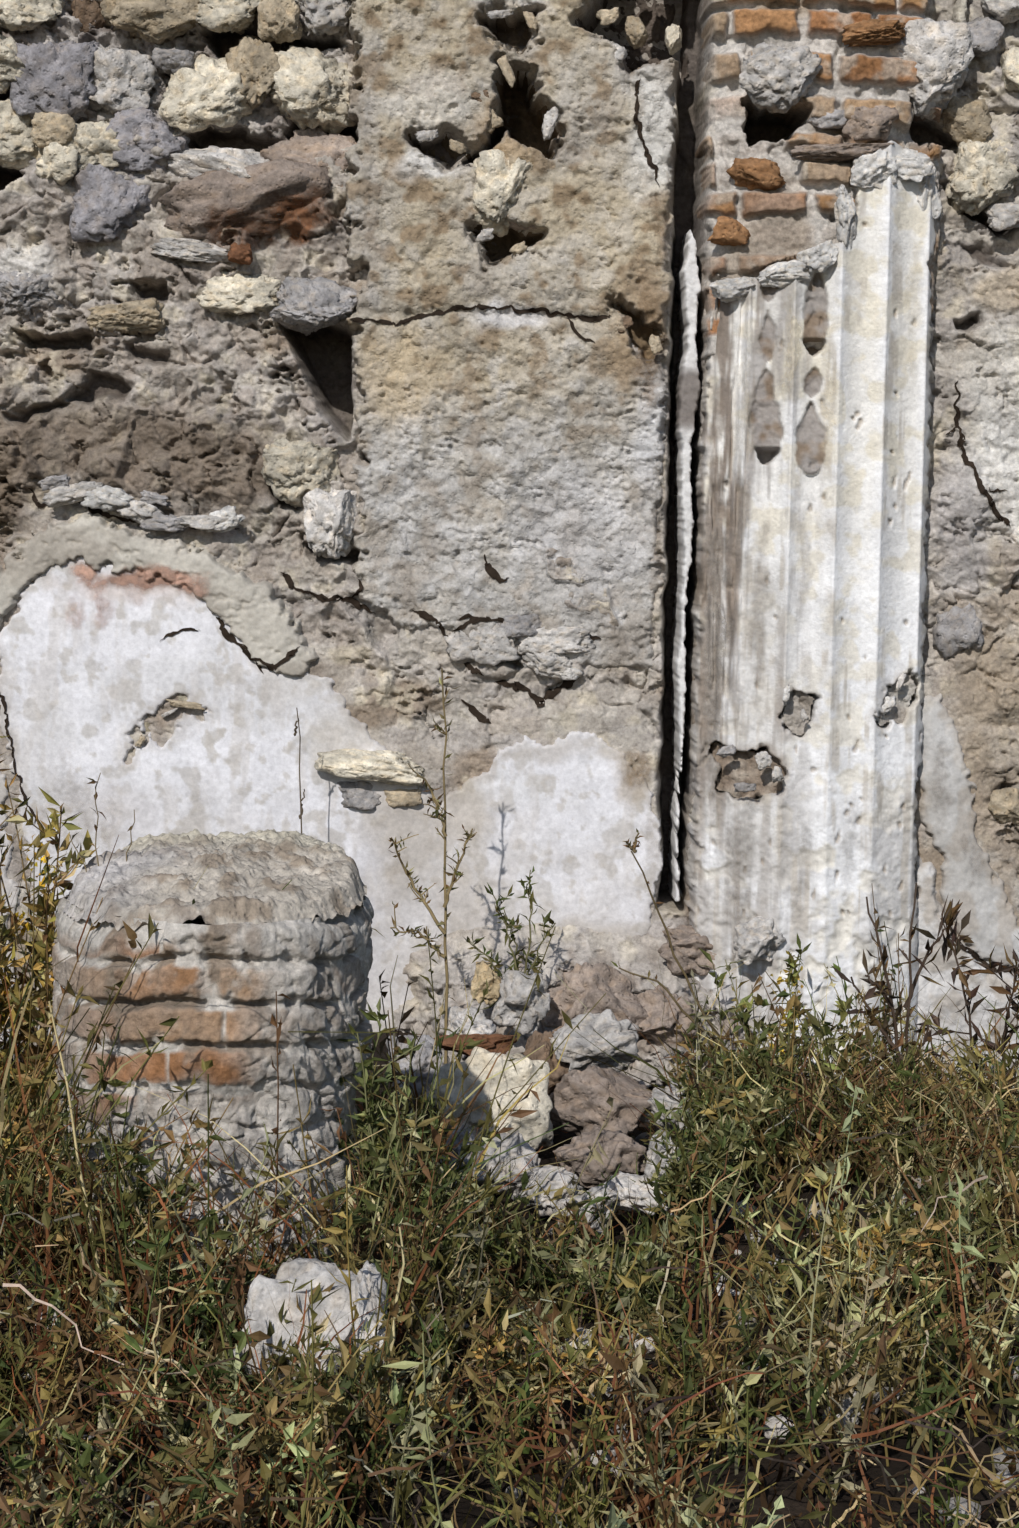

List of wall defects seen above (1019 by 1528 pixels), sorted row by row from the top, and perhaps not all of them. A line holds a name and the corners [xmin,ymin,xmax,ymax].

crack [350,304,611,343]
spalling [135,694,205,747]
spalling [781,684,814,735]
spalling [876,672,917,726]
spalling [710,742,786,798]